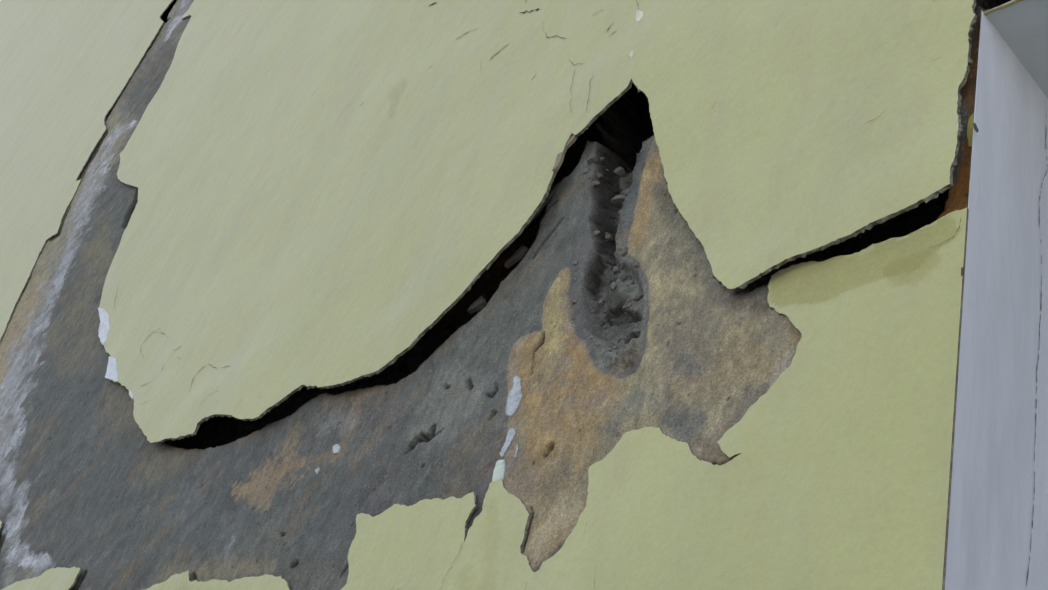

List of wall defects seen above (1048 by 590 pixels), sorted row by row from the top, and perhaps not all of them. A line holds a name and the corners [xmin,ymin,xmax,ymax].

water stain [164,0,186,40]
crack [520,1,594,110]
spalling [949,0,1024,213]
water stain [0,120,137,573]
flaking render [0,0,809,590]